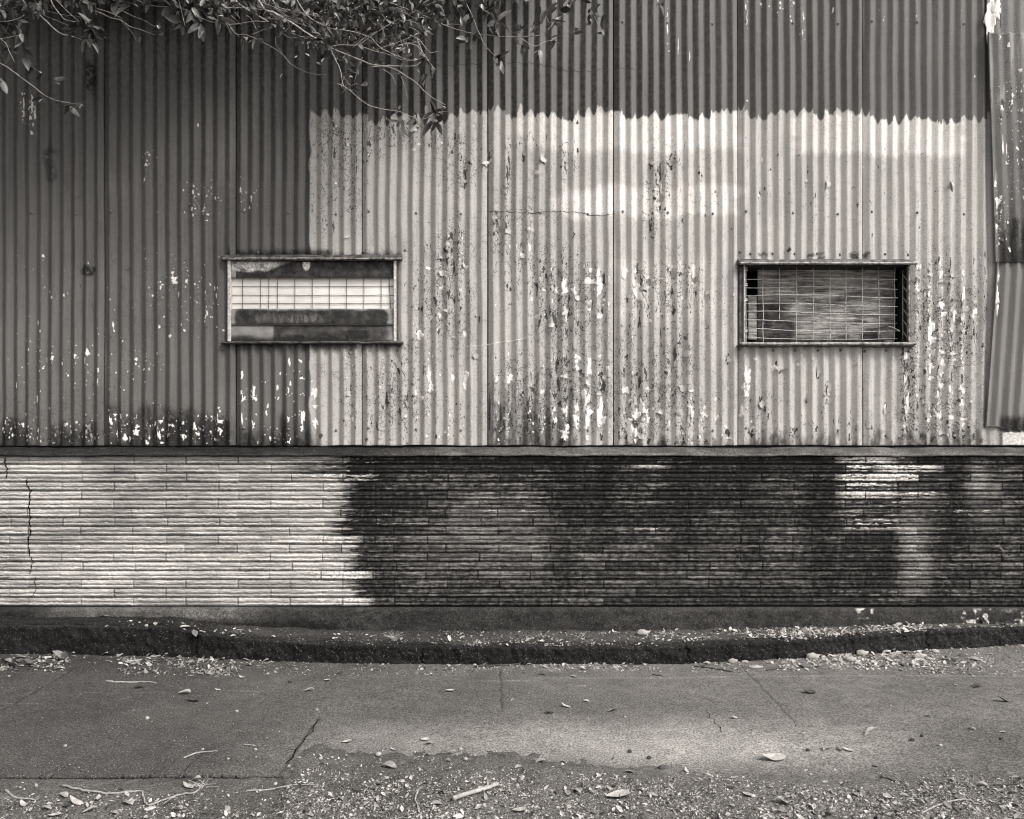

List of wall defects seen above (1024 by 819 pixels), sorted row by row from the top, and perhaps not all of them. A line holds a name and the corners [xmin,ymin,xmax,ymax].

peeling [983,0,1011,47]
peeling [308,61,1024,447]
peeling [16,287,164,410]
peeling [2,401,226,447]
peeling [240,358,324,446]
crack [4,457,36,596]